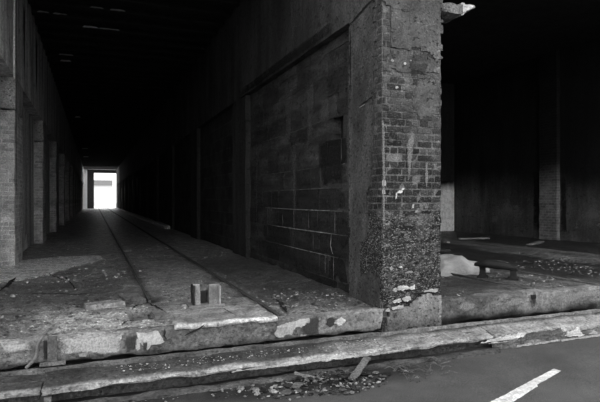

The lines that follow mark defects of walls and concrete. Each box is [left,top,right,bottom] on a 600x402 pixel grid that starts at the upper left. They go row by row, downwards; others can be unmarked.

spalling [385,284,415,312]
peeling [274,318,310,338]
spalling [326,317,346,327]
peeling [1,343,29,352]
peeling [61,335,122,357]
peeling [135,331,164,351]